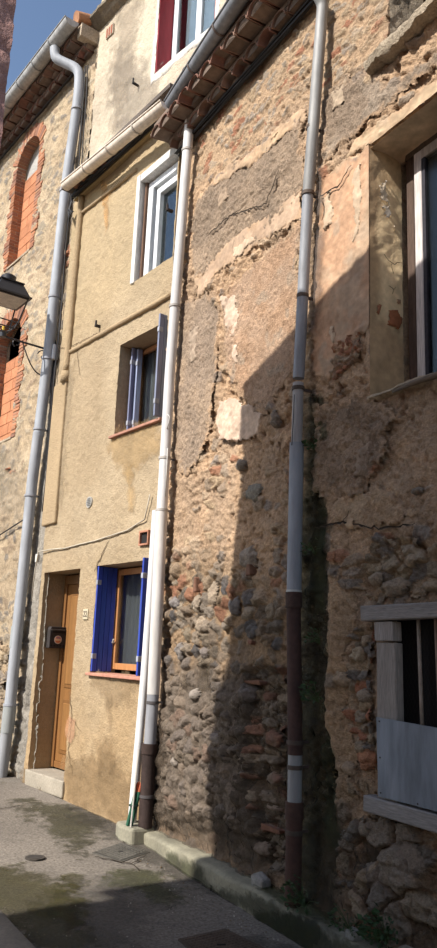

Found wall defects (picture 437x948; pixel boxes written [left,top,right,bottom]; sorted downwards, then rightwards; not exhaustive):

crack [209,170,279,234]
peeling [310,53,437,381]
peeling [172,108,307,477]
flaking render [192,580,219,659]
leakage [166,852,211,890]
spalling [335,815,437,940]